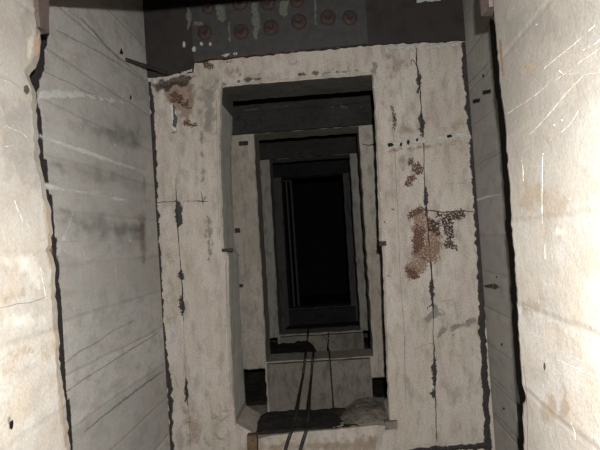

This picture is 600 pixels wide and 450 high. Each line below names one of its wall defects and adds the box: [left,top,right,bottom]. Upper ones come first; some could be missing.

corrosion [169,91,192,109]
corrosion [404,157,424,187]
crack [157,194,185,326]
corrosion [404,204,466,280]
crack [404,48,472,438]
crack [183,377,191,426]